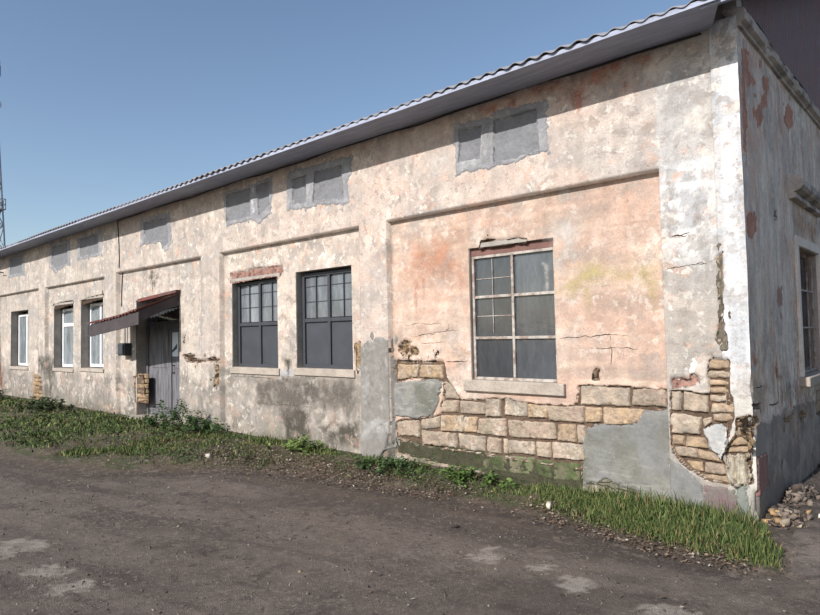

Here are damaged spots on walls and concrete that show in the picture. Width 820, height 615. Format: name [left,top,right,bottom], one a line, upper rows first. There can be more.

peeling [741,48,769,158]
peeling [783,96,793,132]
peeling [746,211,757,239]
spalling [182,353,220,389]
crack [404,321,466,362]
flaking render [388,243,761,490]
crack [560,334,636,365]
leakage [257,366,352,439]
leakage [323,425,357,442]